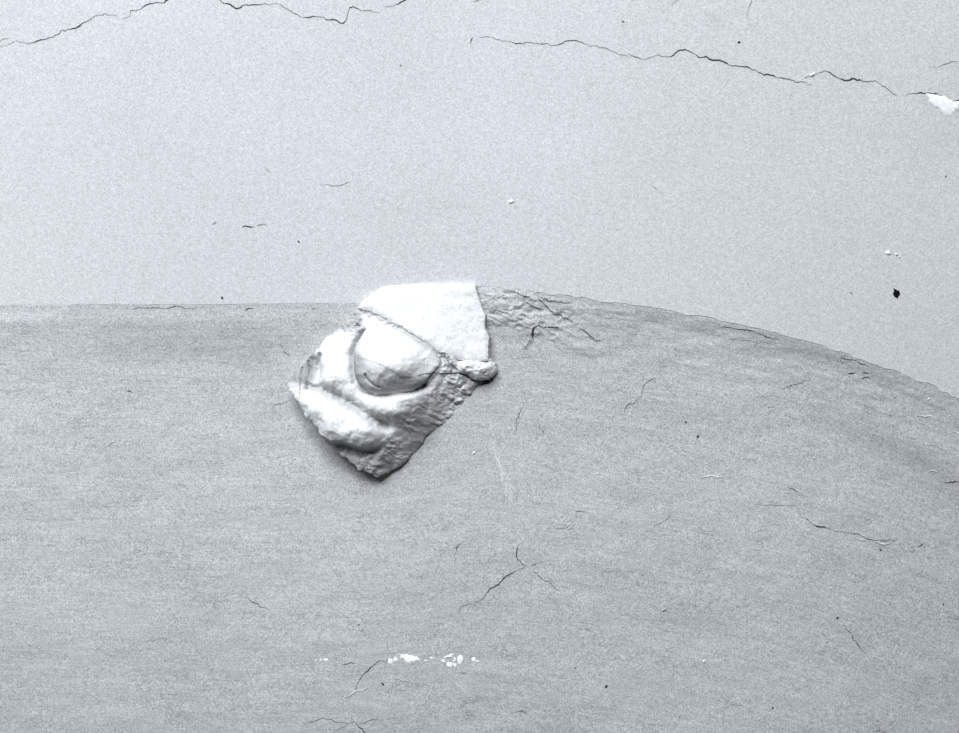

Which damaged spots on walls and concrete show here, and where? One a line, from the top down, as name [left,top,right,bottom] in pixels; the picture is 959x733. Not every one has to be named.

crack [1,0,167,46]
crack [220,0,405,24]
crack [470,36,958,101]
spalling [926,93,959,116]
crack [458,545,560,613]